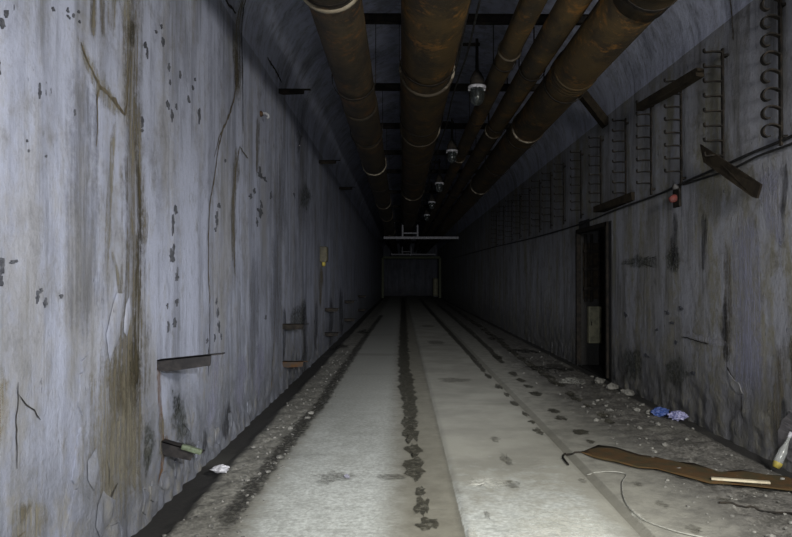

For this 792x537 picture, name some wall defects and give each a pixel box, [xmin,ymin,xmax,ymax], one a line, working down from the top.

crack [81,43,130,146]
leakage [90,0,149,483]
crack [208,0,248,294]
crack [16,382,41,460]